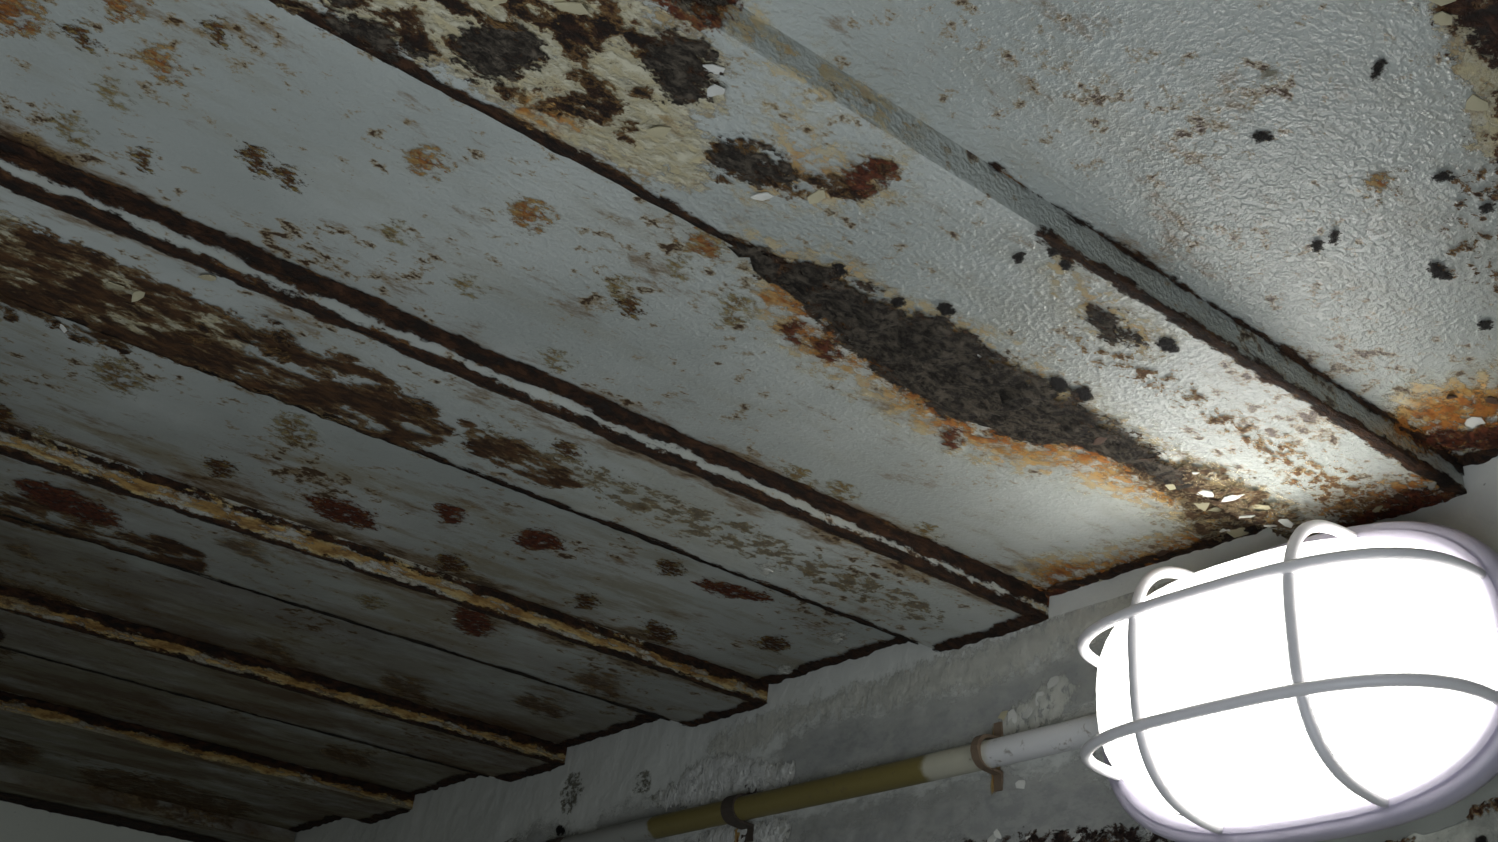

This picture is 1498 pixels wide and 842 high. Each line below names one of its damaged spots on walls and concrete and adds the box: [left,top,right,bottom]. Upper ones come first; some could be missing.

peeling [1370,58,1388,81]
peeling [1249,130,1274,144]
rust [0,0,1267,655]
rust [988,162,1498,537]
rust [0,210,944,832]
rust [0,792,225,842]
peeling [697,815,792,842]